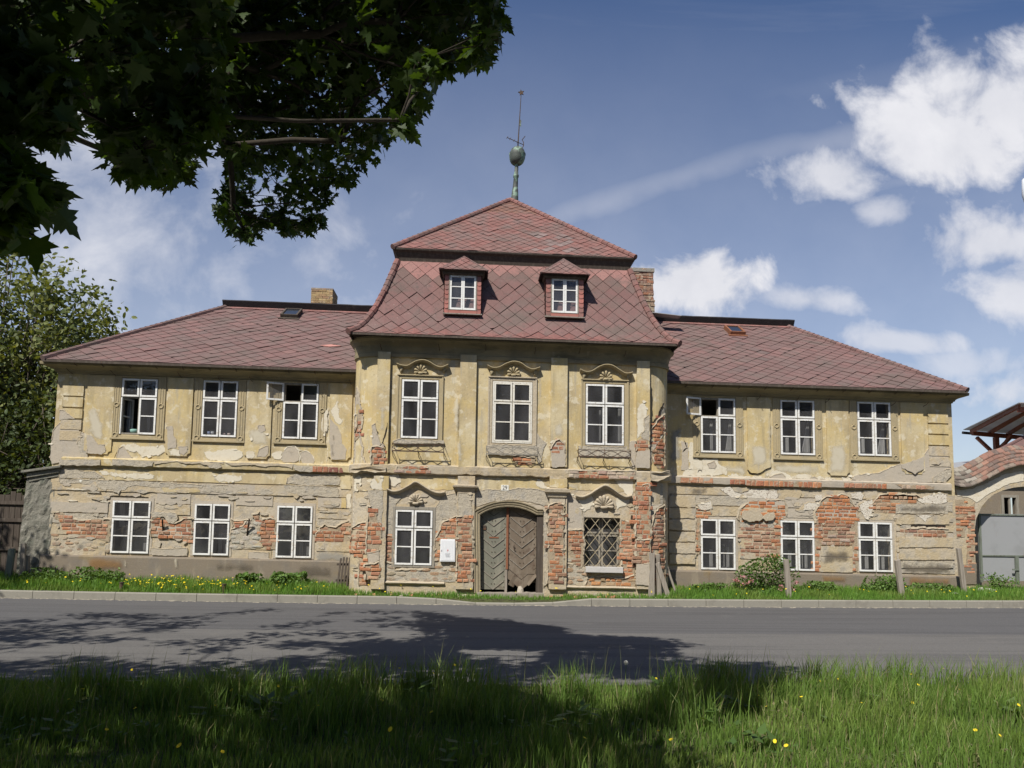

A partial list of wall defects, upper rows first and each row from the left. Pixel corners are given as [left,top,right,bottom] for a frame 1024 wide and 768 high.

flaking render [48,386,669,589]
flaking render [680,441,1024,584]